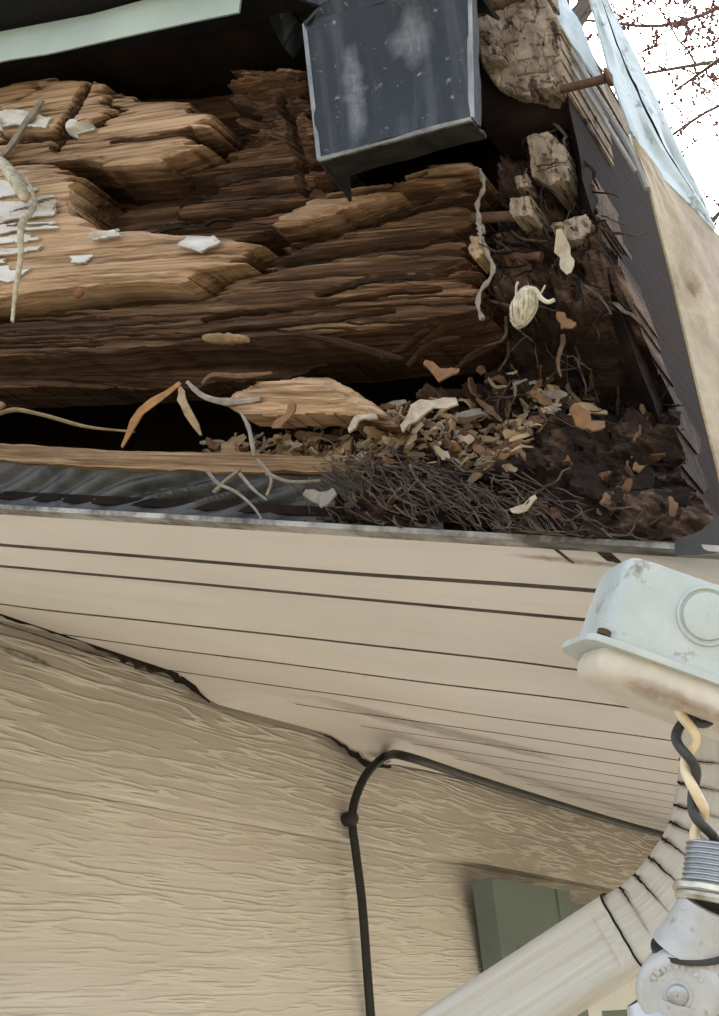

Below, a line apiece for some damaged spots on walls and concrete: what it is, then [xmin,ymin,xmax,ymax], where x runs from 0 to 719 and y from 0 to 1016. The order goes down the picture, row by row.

peeling [0,109,54,132]
crack [49,93,87,150]
peeling [65,119,97,139]
peeling [0,179,61,283]
peeling [88,229,121,241]
crack [150,217,239,234]
peeling [178,235,222,254]
crack [299,196,470,295]
peeling [70,254,95,264]
crack [0,614,210,703]
crack [324,735,392,768]